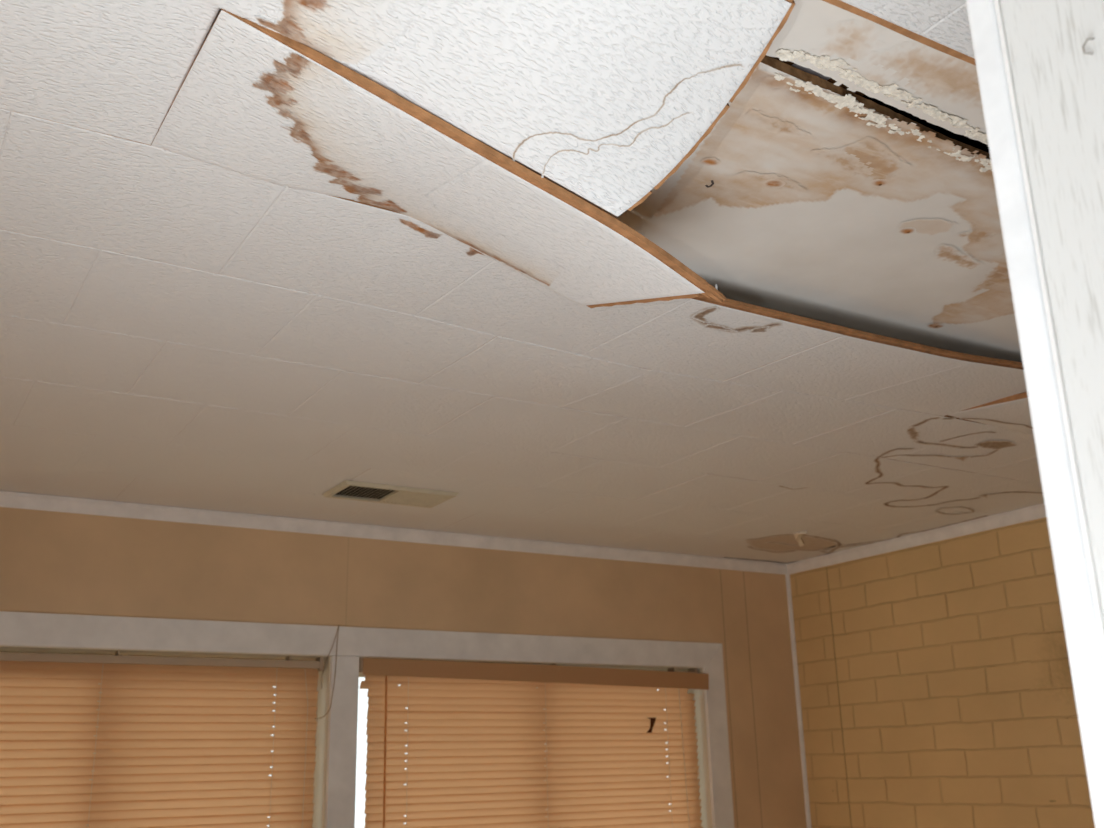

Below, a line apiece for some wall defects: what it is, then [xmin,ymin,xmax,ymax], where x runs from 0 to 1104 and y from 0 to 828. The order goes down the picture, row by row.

leakage [249,0,565,287]
leakage [512,19,1015,325]
peeling [774,49,993,172]
leakage [689,306,784,333]
leakage [743,416,1043,553]